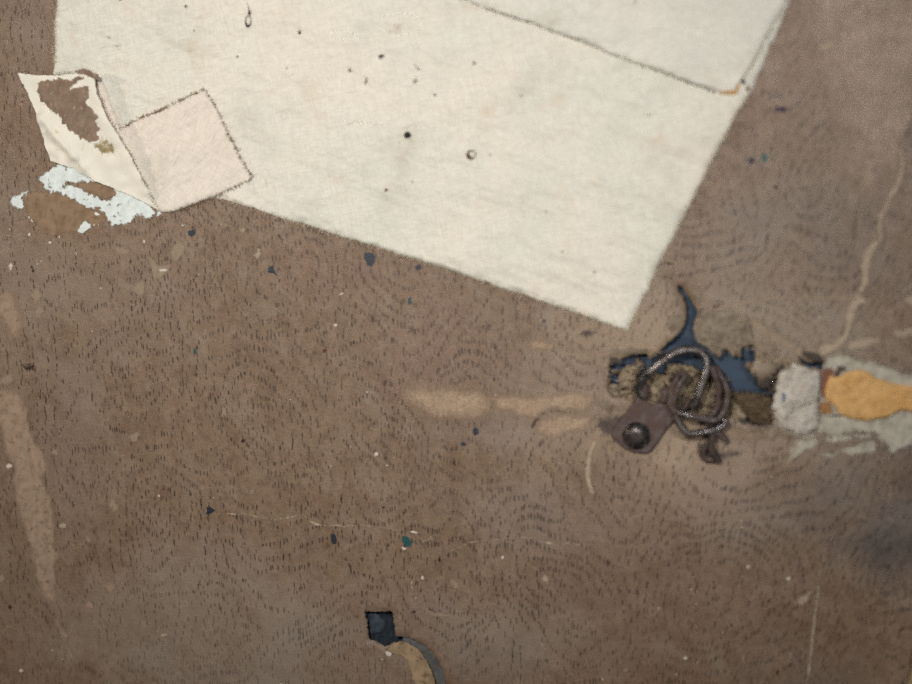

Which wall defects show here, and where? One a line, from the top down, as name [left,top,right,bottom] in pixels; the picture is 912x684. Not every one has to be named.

peeling [10,164,162,244]
crack [685,105,912,417]
spalling [595,310,824,441]
water stain [0,375,59,605]
spalling [366,611,446,684]